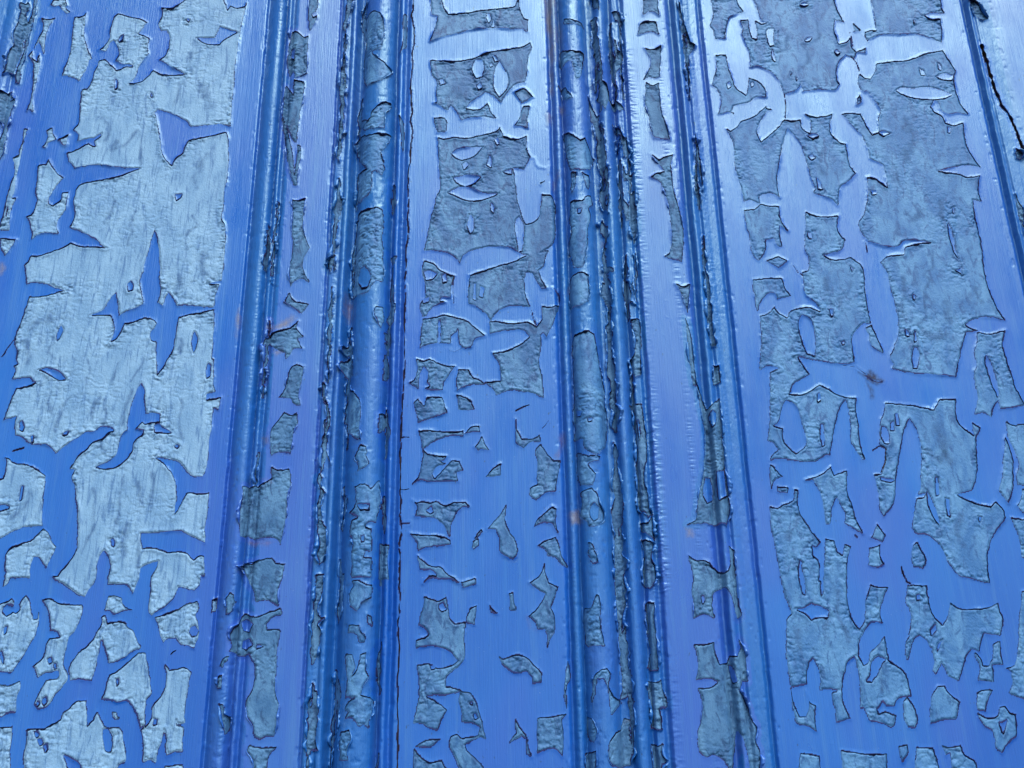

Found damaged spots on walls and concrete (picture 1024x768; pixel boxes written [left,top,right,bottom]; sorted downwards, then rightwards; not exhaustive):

peeling [0,0,410,768]
peeling [407,0,766,768]
peeling [706,0,1024,768]
crack [977,40,1024,154]